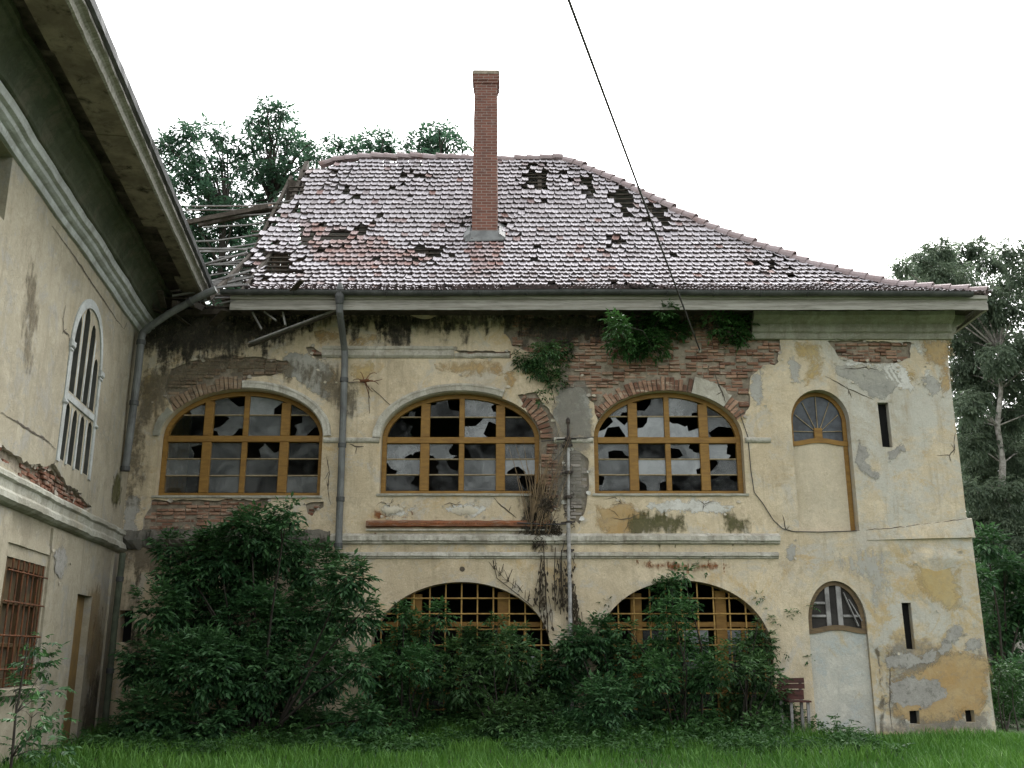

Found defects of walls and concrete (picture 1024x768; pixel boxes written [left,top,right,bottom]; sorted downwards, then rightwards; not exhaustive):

damp [21,263,38,365]
damp [116,308,356,505]
flaking render [438,314,955,534]
flaking render [0,443,90,509]
flaking render [122,496,271,531]
peeling [884,624,990,723]